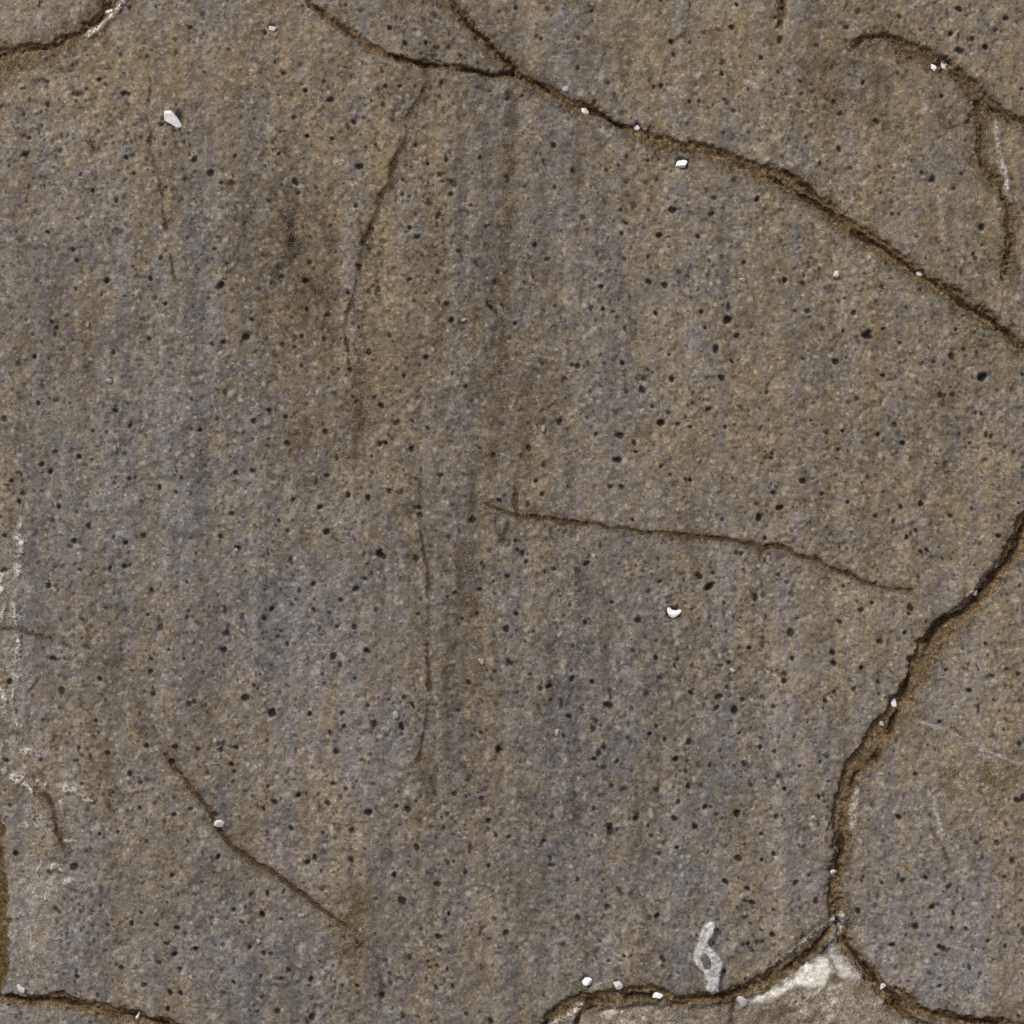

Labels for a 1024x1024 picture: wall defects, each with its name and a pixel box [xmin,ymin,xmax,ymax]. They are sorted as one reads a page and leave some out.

crack [0,0,127,67]
crack [305,0,1024,355]
crack [344,297,353,370]
crack [485,491,913,593]
crack [0,822,176,1024]
crack [164,753,362,946]
crack [541,511,1024,1024]